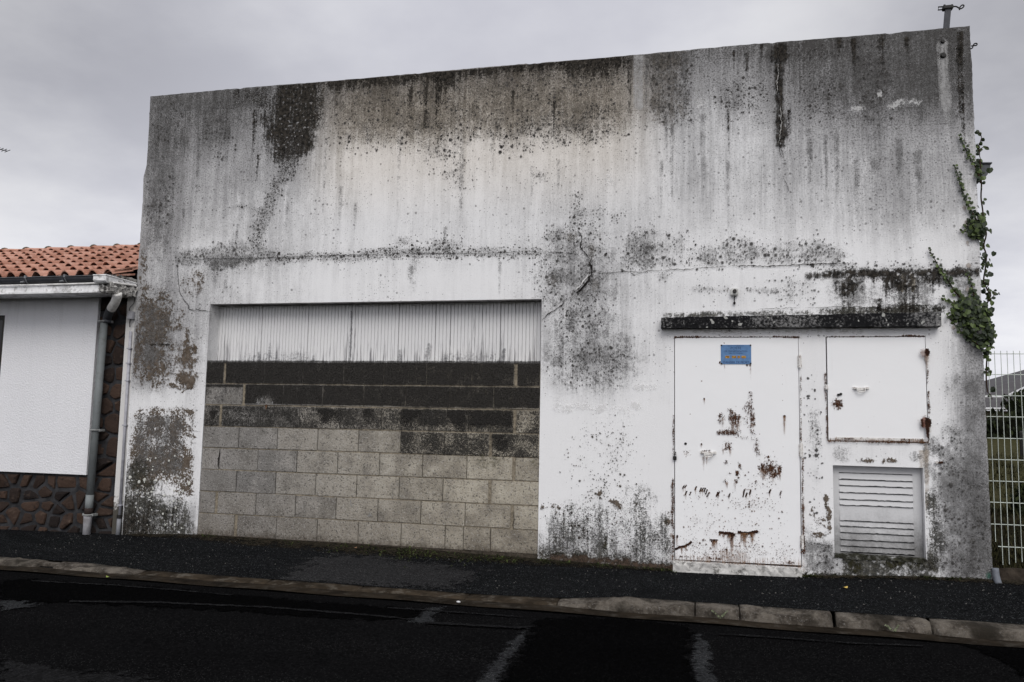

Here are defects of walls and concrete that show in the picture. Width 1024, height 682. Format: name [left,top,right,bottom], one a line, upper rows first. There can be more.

crack [147,230,855,320]
damp [144,27,980,458]
damp [122,458,211,536]
damp [516,490,673,571]
rust [671,392,806,568]
damp [802,371,990,581]